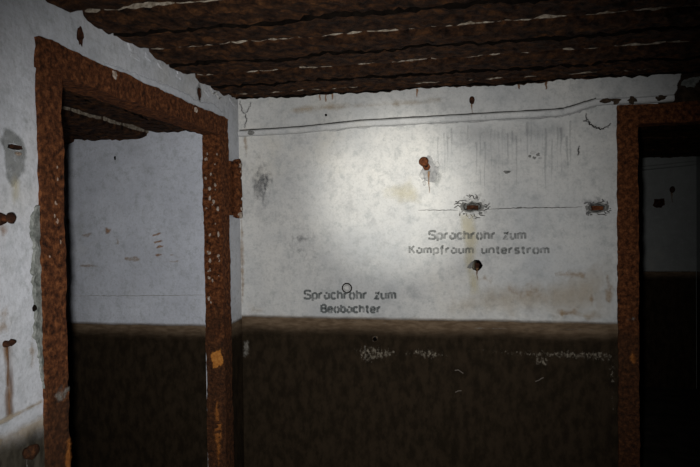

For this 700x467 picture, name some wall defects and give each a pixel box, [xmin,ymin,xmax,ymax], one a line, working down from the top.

crack [239,97,611,132]
hole [454,194,491,219]
hole [584,199,612,217]
corrosion [211,349,223,368]